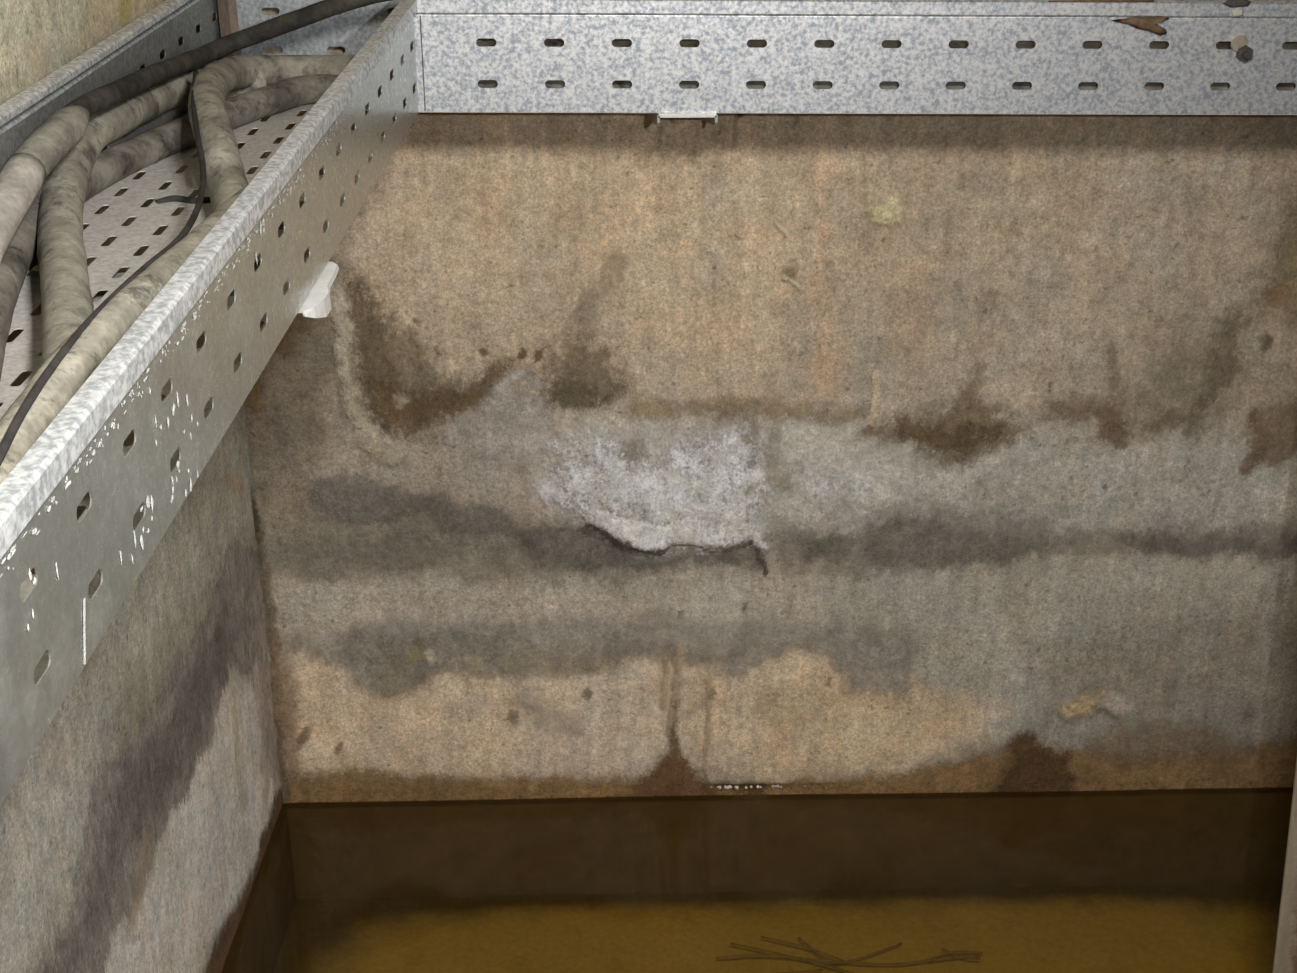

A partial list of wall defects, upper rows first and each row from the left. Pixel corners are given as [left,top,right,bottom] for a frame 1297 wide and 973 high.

leakage [343,277,627,438]
leakage [1052,313,1246,448]
leakage [29,364,1297,973]